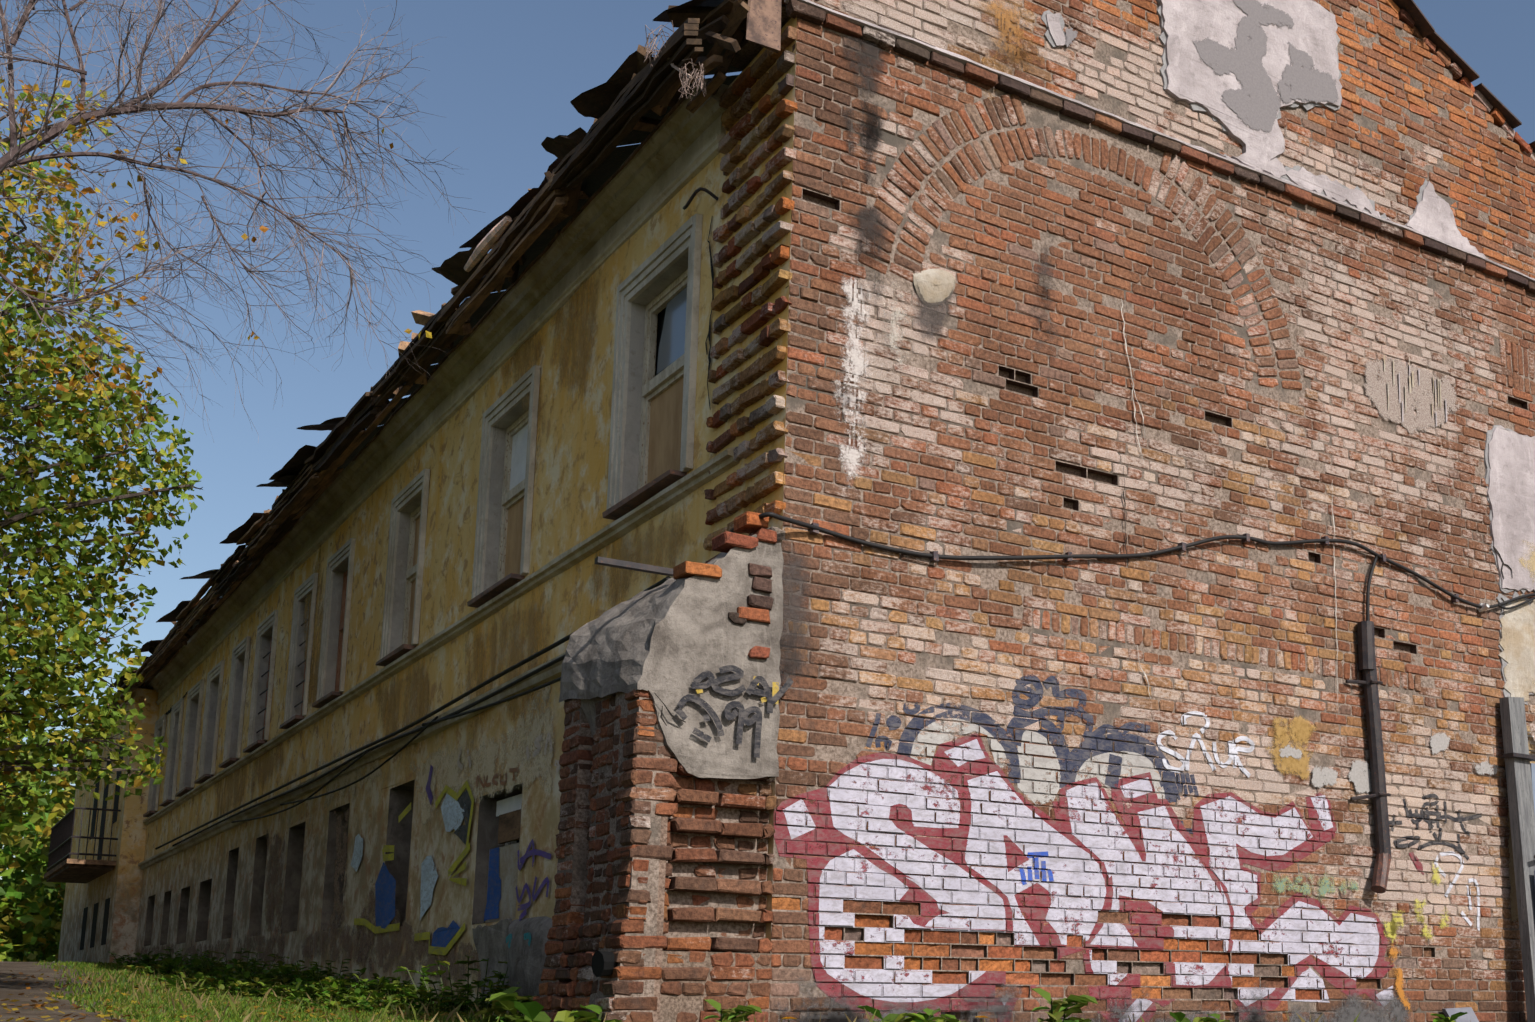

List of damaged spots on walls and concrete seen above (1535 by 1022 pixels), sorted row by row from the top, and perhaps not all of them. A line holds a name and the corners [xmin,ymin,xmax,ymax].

peeling [1041,10,1078,48]
damp [844,37,884,181]
peeling [1156,0,1486,258]
damp [837,207,904,475]
flaking render [673,511,777,625]
flaking render [748,646,770,659]